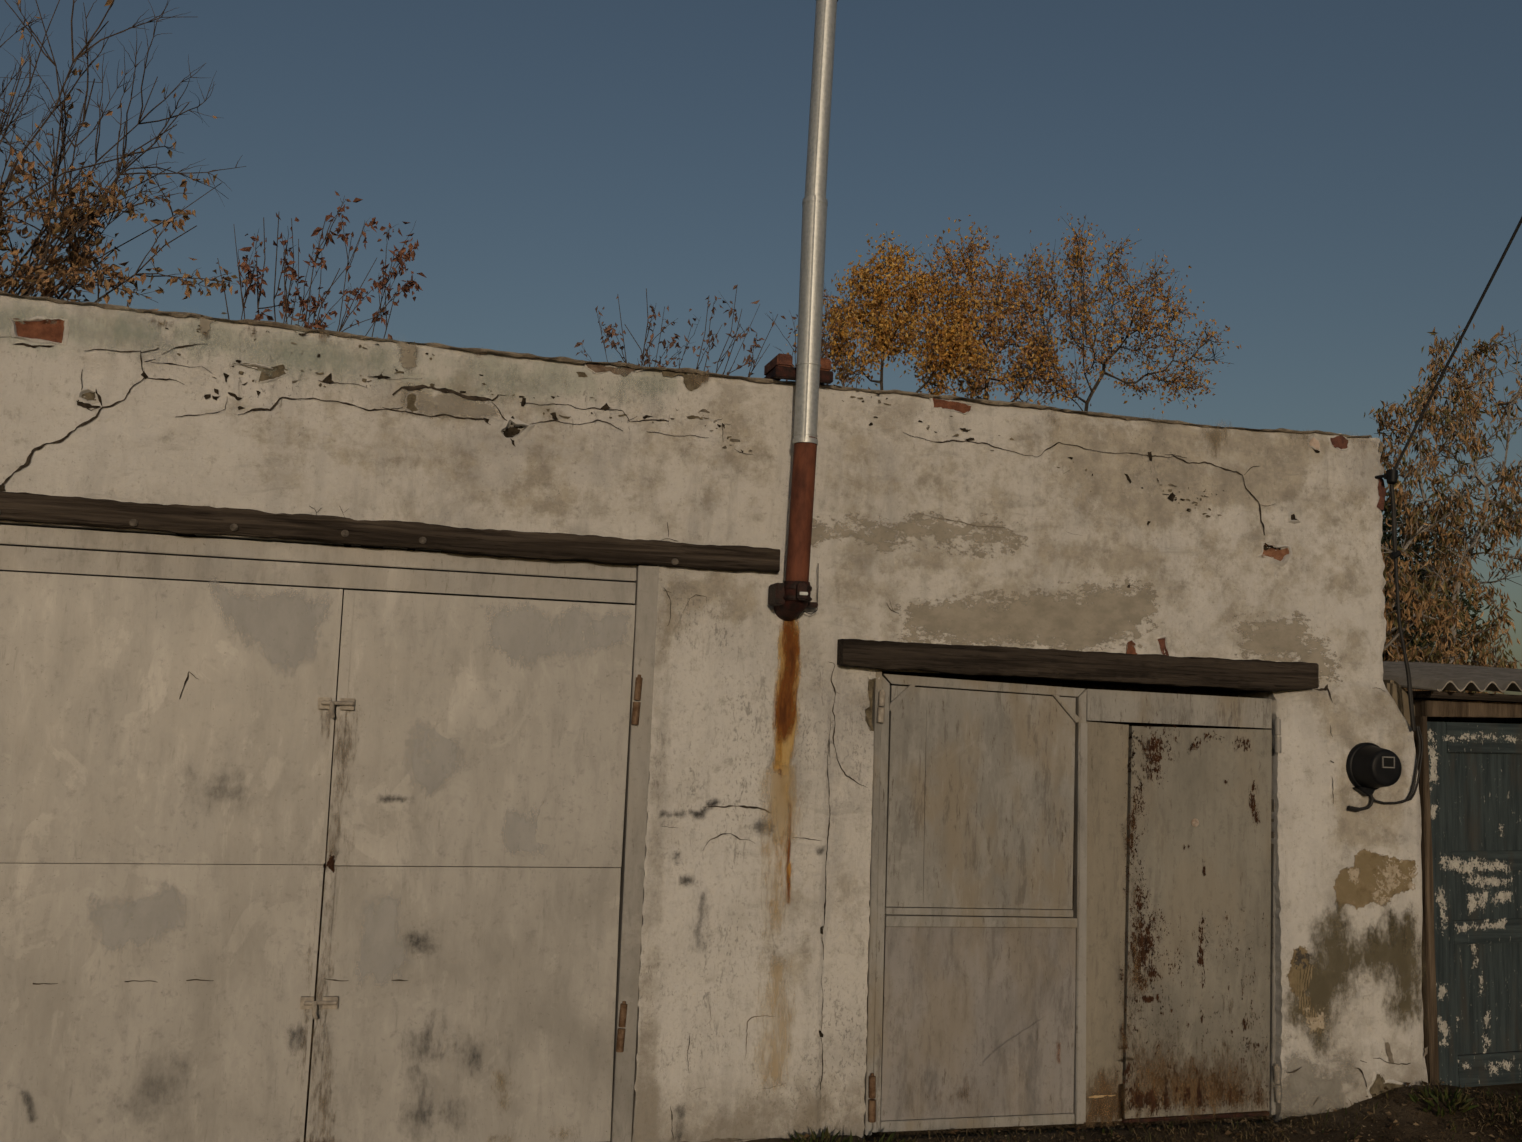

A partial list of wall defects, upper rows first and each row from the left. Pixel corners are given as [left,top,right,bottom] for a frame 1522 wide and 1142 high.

flaking render [7,315,70,348]
crack [0,344,753,491]
crack [903,428,1273,535]
corrosion [770,619,800,911]
peeling [1427,730,1519,819]
crack [662,662,866,1099]
corrosion [1086,721,1274,1125]
peeling [1286,946,1328,1036]
peeling [1333,848,1418,910]
spalling [1366,1042,1411,1098]
peeling [1424,982,1460,1058]
peeling [1435,854,1514,1075]